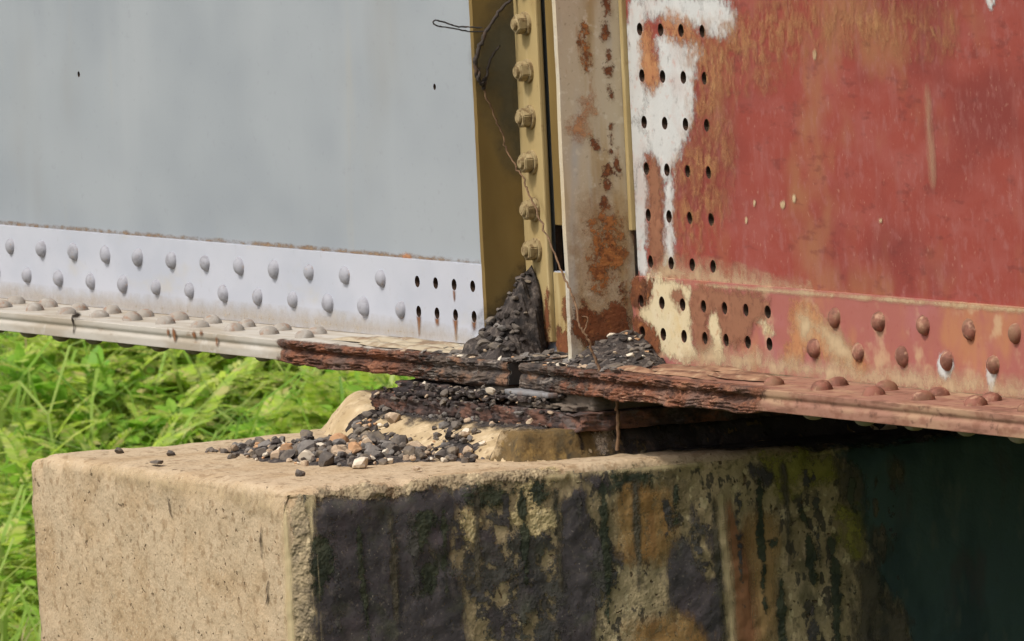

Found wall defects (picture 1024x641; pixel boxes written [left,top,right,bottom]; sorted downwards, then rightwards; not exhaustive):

rust [576,0,615,99]
rust [639,30,659,91]
rust [661,3,894,115]
rust [506,96,770,414]
peeling [616,0,1024,397]
rust [277,339,449,380]
water stain [306,473,641,641]
water stain [662,484,726,641]
water stain [734,463,844,641]